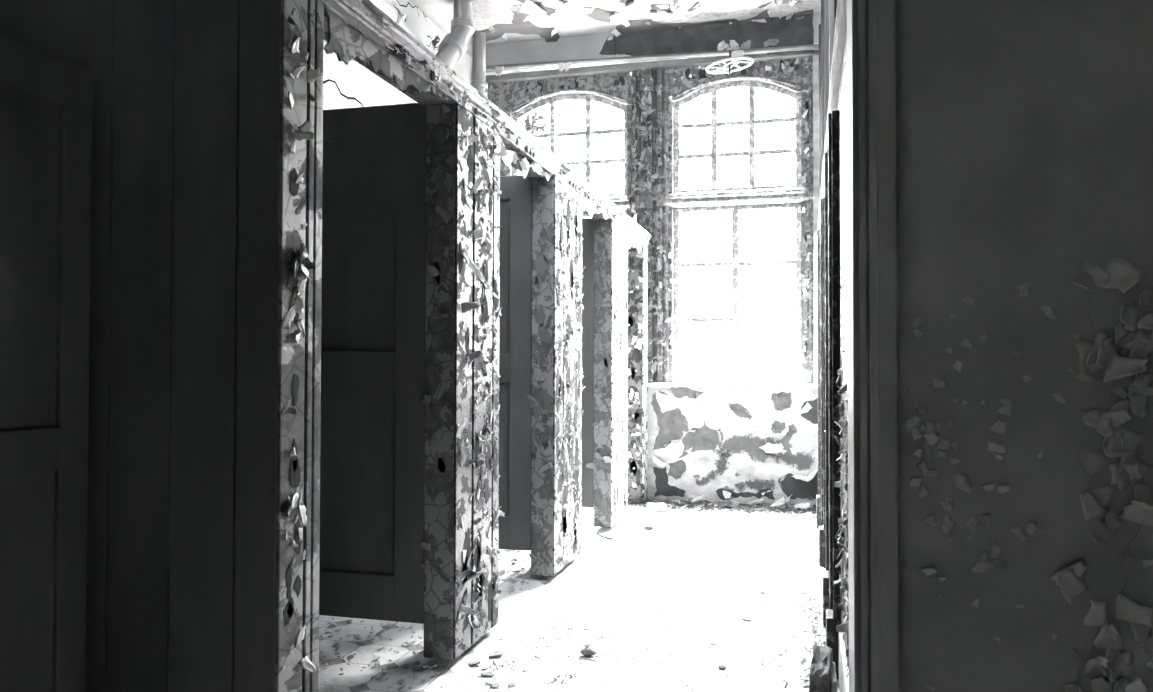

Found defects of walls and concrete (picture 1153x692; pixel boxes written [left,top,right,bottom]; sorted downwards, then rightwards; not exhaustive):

peeling [287,8,320,110]
peeling [482,0,569,42]
peeling [582,0,814,81]
peeling [290,120,315,154]
peeling [289,168,307,229]
peeling [280,243,315,343]
peeling [379,23,820,635]
peeling [281,374,299,415]
peeling [759,241,849,678]
peeling [283,439,317,674]
spalling [468,650,504,677]